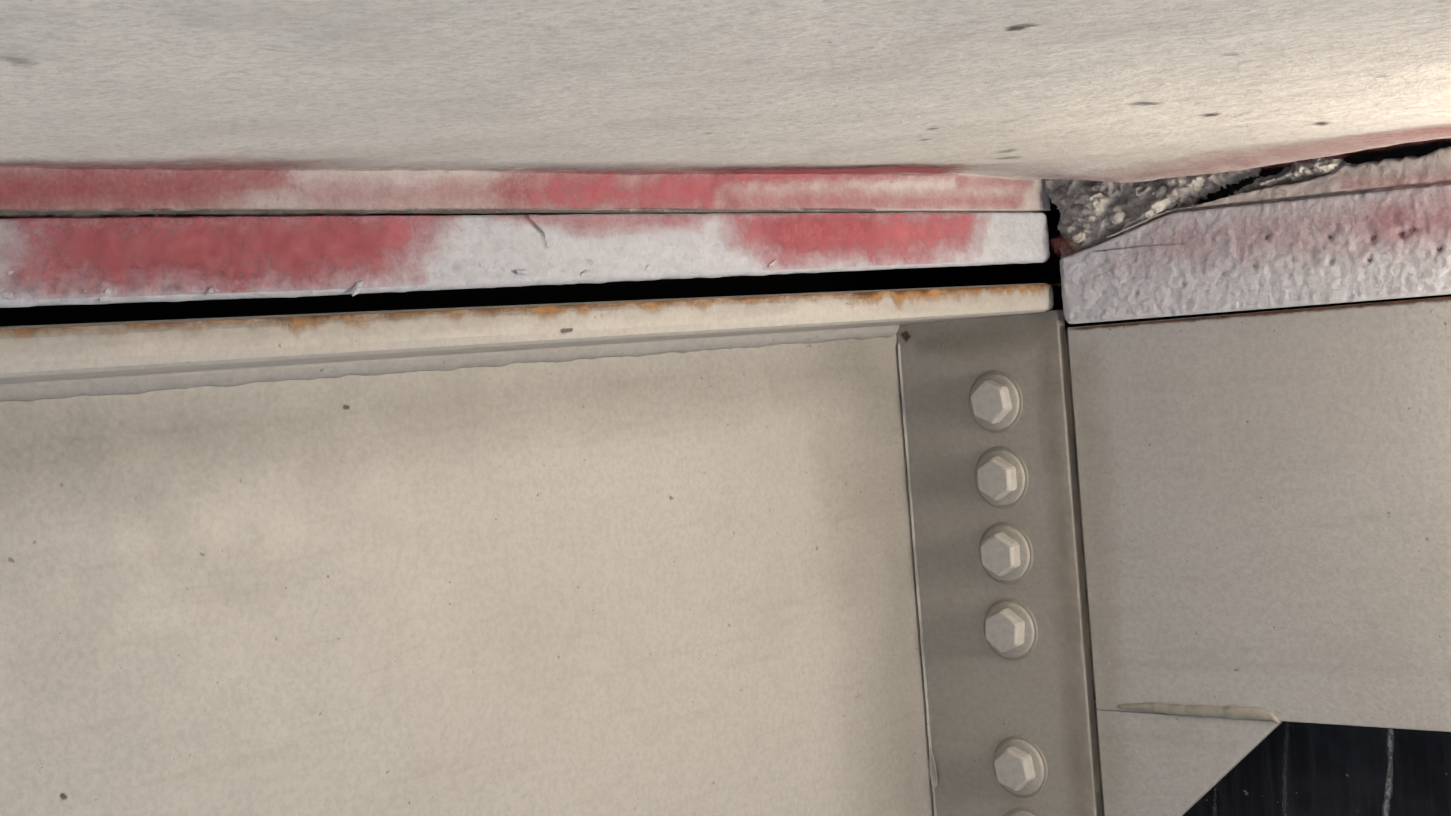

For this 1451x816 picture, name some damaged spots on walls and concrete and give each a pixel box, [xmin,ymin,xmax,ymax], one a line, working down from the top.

spalling [1043,167,1261,259]